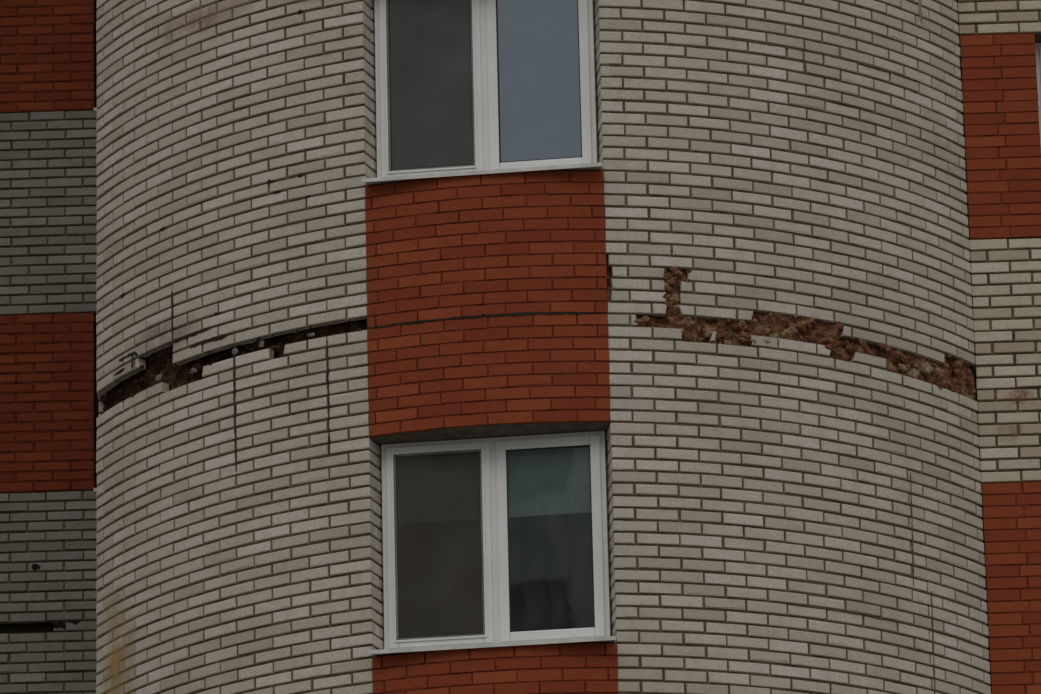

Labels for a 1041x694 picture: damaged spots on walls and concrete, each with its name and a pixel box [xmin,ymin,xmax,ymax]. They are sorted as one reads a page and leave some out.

spalling [101,321,367,412]
spalling [634,266,976,400]
crack [0,619,80,634]